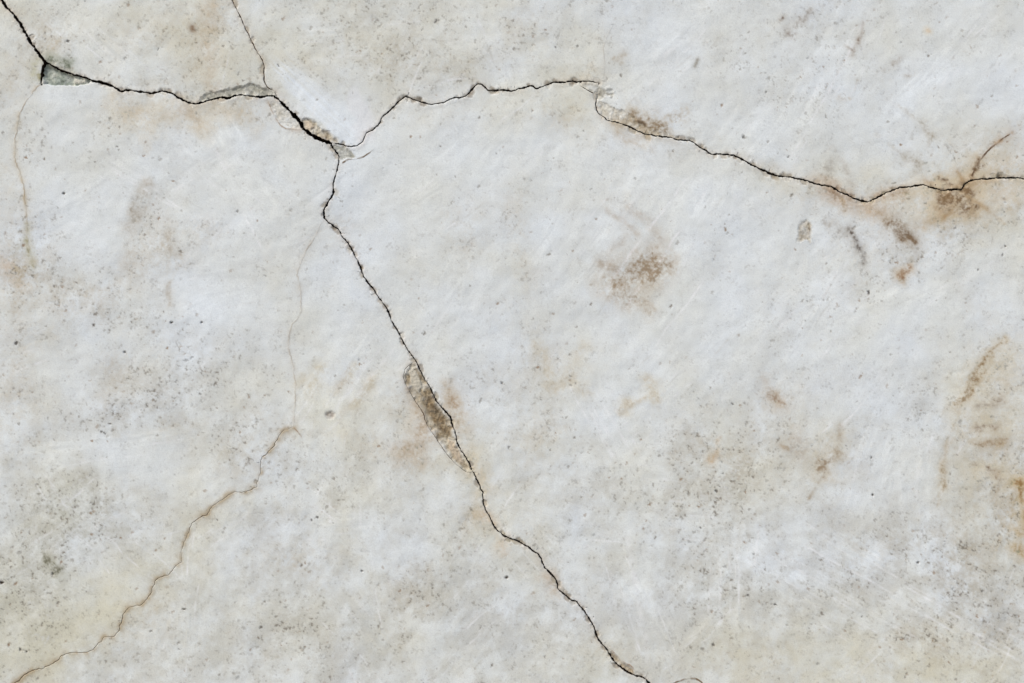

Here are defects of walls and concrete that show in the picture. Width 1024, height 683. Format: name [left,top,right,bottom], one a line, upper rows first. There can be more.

flaking render [43,69,91,86]
crack [0,0,1024,259]
crack [9,142,655,683]
flaking render [399,359,474,477]
crack [672,675,703,683]